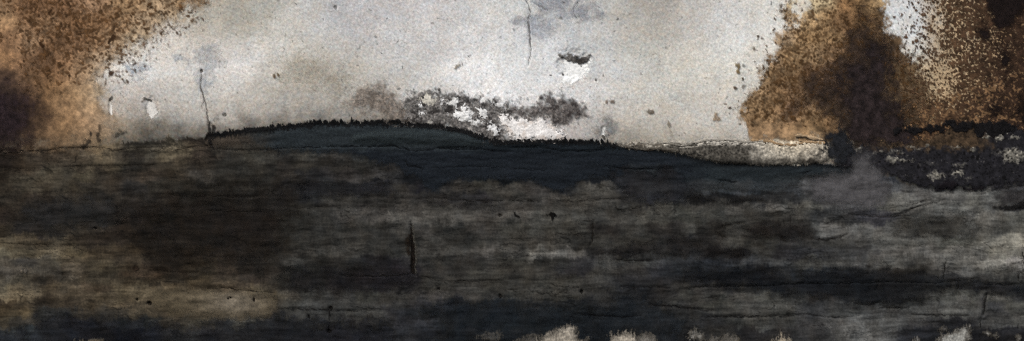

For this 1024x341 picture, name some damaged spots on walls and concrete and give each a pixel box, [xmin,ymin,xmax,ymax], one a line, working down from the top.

rust [0,0,206,154]
crack [1,74,668,171]
damp [207,84,1024,213]
rust [713,0,1024,149]
damp [0,309,398,341]
damp [287,264,414,298]
damp [419,293,688,341]
crack [344,223,1024,328]
damp [602,221,1024,309]
damp [894,215,980,242]